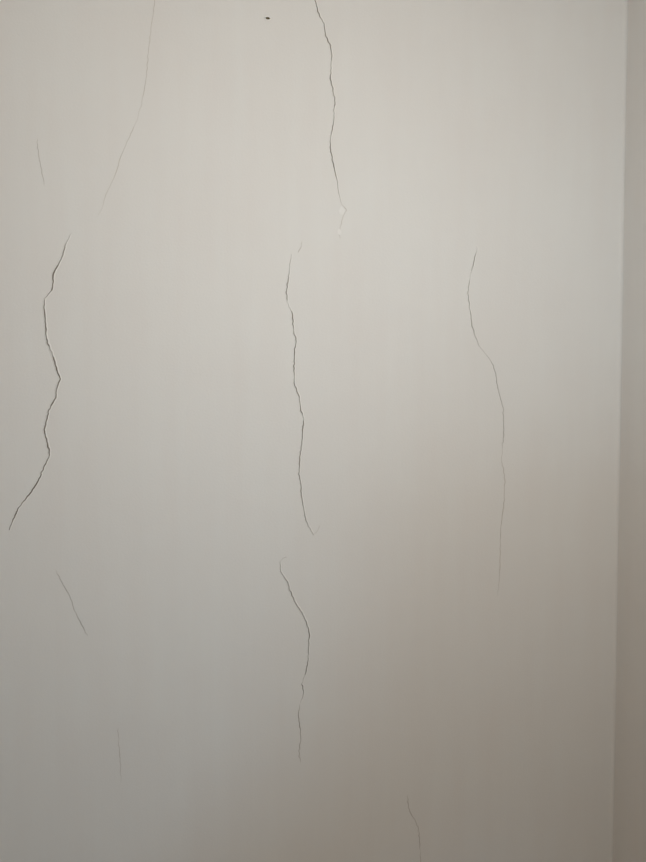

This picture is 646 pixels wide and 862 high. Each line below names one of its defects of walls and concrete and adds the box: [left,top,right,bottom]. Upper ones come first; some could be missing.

crack [314,0,347,236]
crack [8,233,72,530]
crack [285,243,319,535]
crack [466,247,505,585]
crack [279,557,311,762]